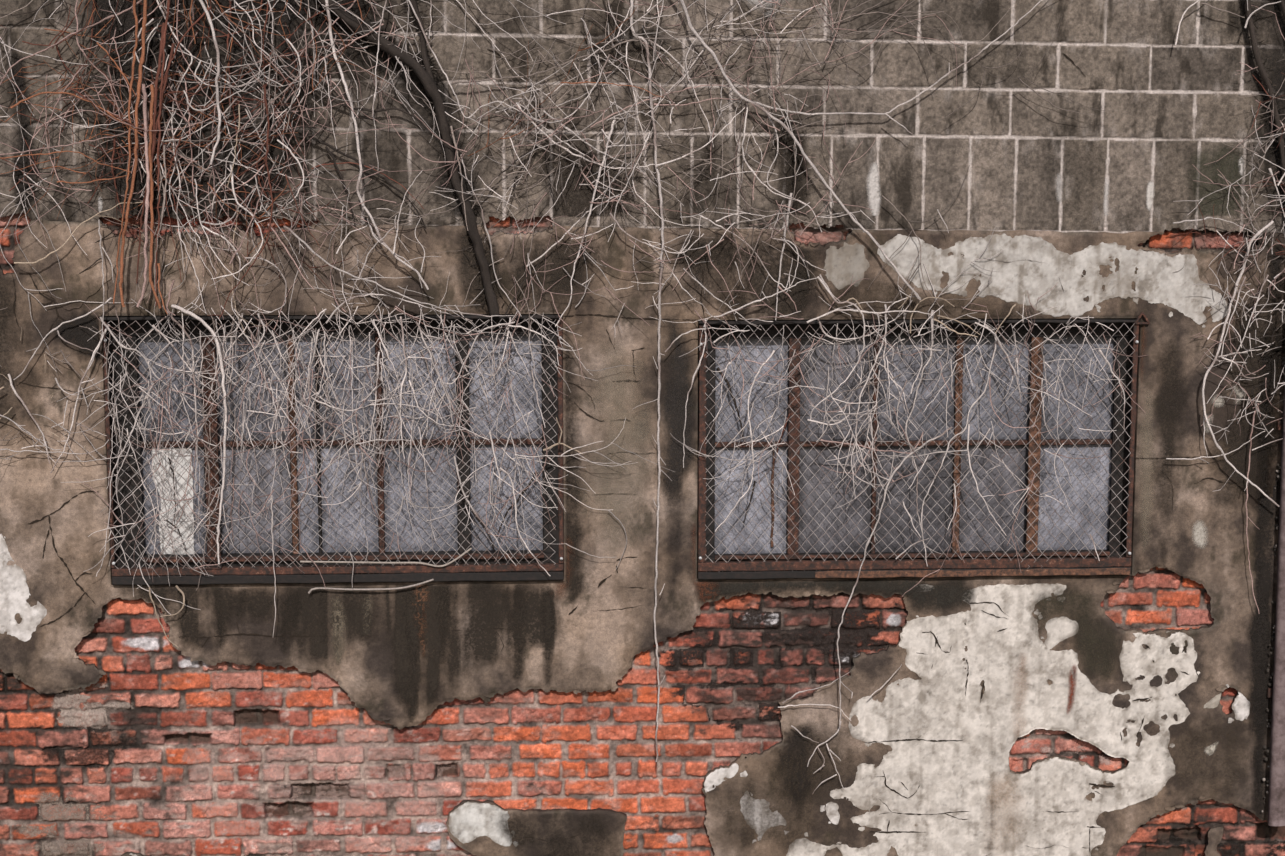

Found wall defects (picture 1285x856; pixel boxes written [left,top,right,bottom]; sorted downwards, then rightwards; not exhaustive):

spalling [0,212,31,274]
peeling [789,222,1258,328]
water stain [664,324,694,505]
peeling [0,534,47,642]
crack [28,491,99,627]
water stain [138,344,582,718]
spalling [0,566,1285,856]